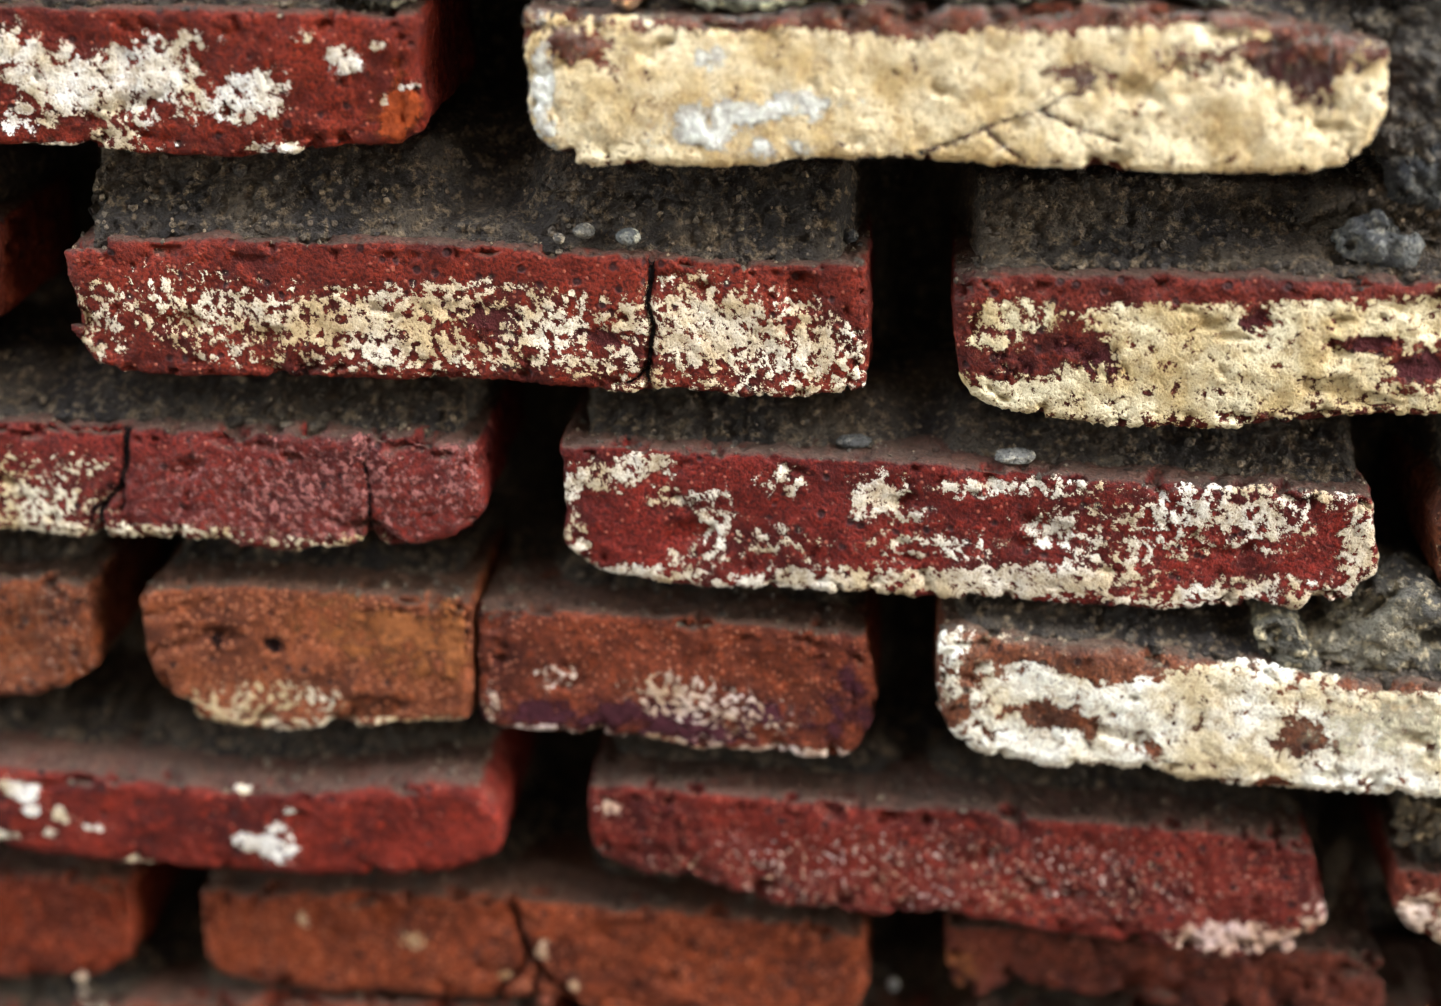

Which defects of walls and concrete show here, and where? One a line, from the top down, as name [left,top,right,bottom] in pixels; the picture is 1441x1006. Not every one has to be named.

crack [627,259,656,385]
crack [90,425,132,524]